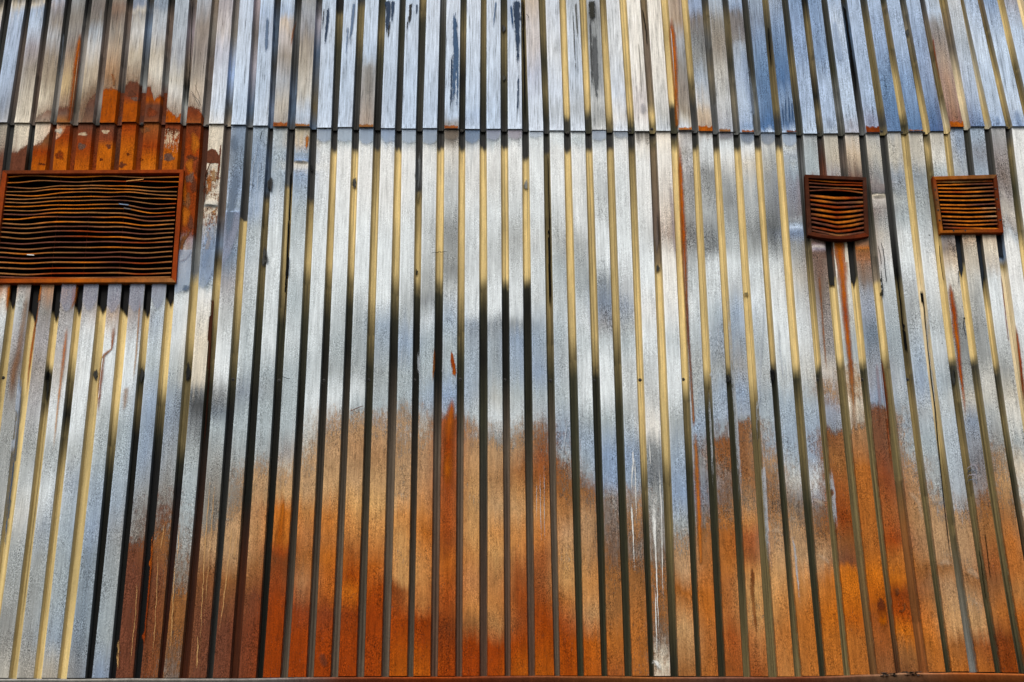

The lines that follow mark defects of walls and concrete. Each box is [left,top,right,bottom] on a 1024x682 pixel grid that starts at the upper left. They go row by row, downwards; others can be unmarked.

corrosion [10,36,204,237]
corrosion [670,23,754,132]
corrosion [678,155,695,423]
corrosion [116,242,1024,678]